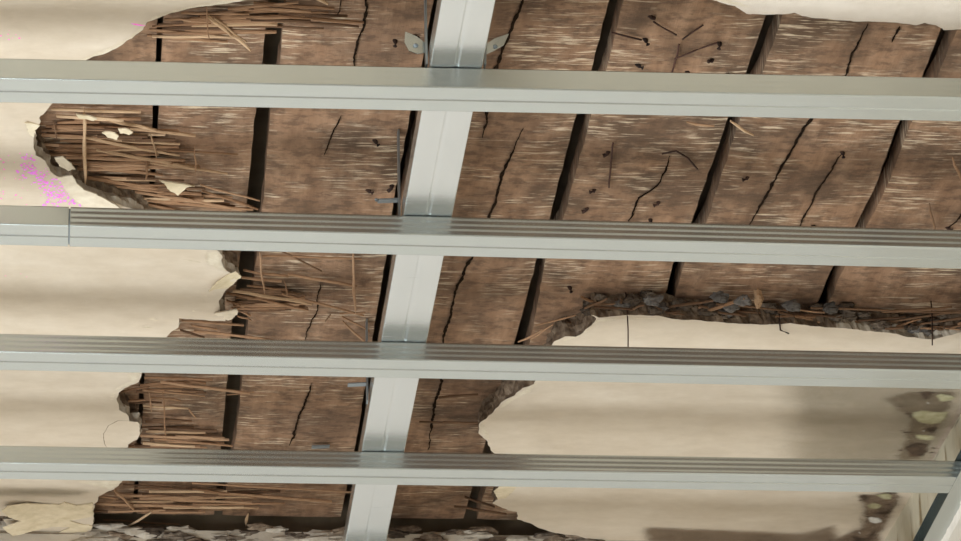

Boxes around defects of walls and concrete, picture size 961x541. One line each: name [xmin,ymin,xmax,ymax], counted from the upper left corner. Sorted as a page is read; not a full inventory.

crack [353,0,368,66]
spalling [25,118,158,209]
peeling [159,180,195,196]
crack [487,129,523,218]
crack [628,156,670,221]
crack [749,118,813,225]
spalling [209,250,241,320]
crack [442,257,473,343]
spalling [544,292,961,345]
spalling [110,373,142,434]
spalling [478,380,535,443]
leakage [765,385,961,461]